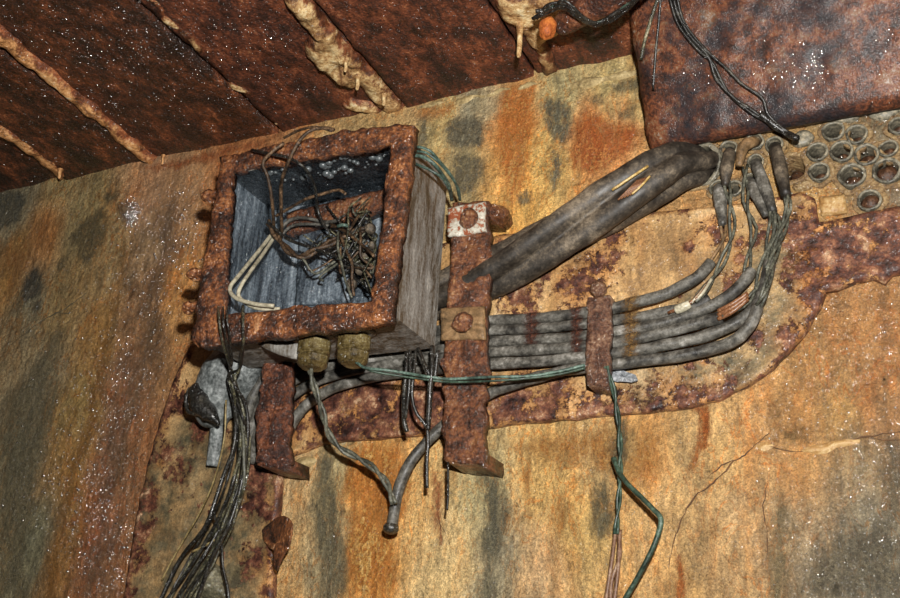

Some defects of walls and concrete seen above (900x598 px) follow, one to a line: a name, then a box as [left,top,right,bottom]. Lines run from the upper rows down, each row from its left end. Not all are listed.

leakage [446,116,482,193]
leakage [416,82,537,146]
leakage [550,150,560,191]
leakage [544,100,571,141]
corrosion [573,116,635,174]
corrosion [524,312,540,344]
corrosion [571,306,582,352]
corrosion [624,295,641,356]
corrosion [690,406,709,469]
crack [851,431,900,441]
crack [669,433,803,565]
leakage [802,529,900,596]